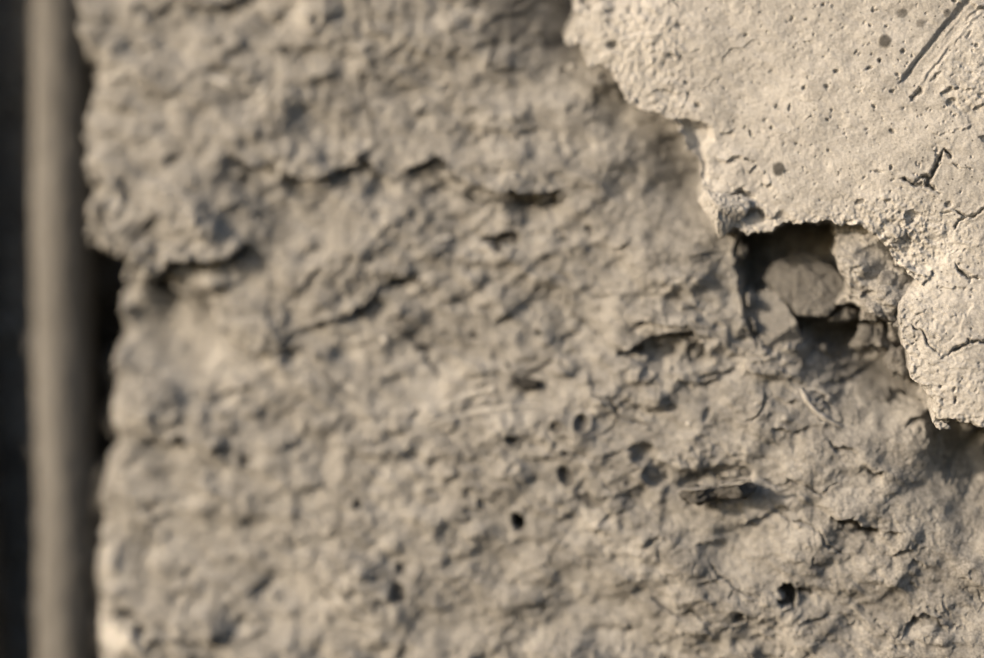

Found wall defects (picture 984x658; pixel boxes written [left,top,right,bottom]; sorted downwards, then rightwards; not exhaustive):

flaking render [563,0,617,92]
spalling [899,0,982,101]
crack [902,150,951,191]
spalling [712,219,925,374]
spalling [919,383,984,481]
spalling [778,582,812,608]